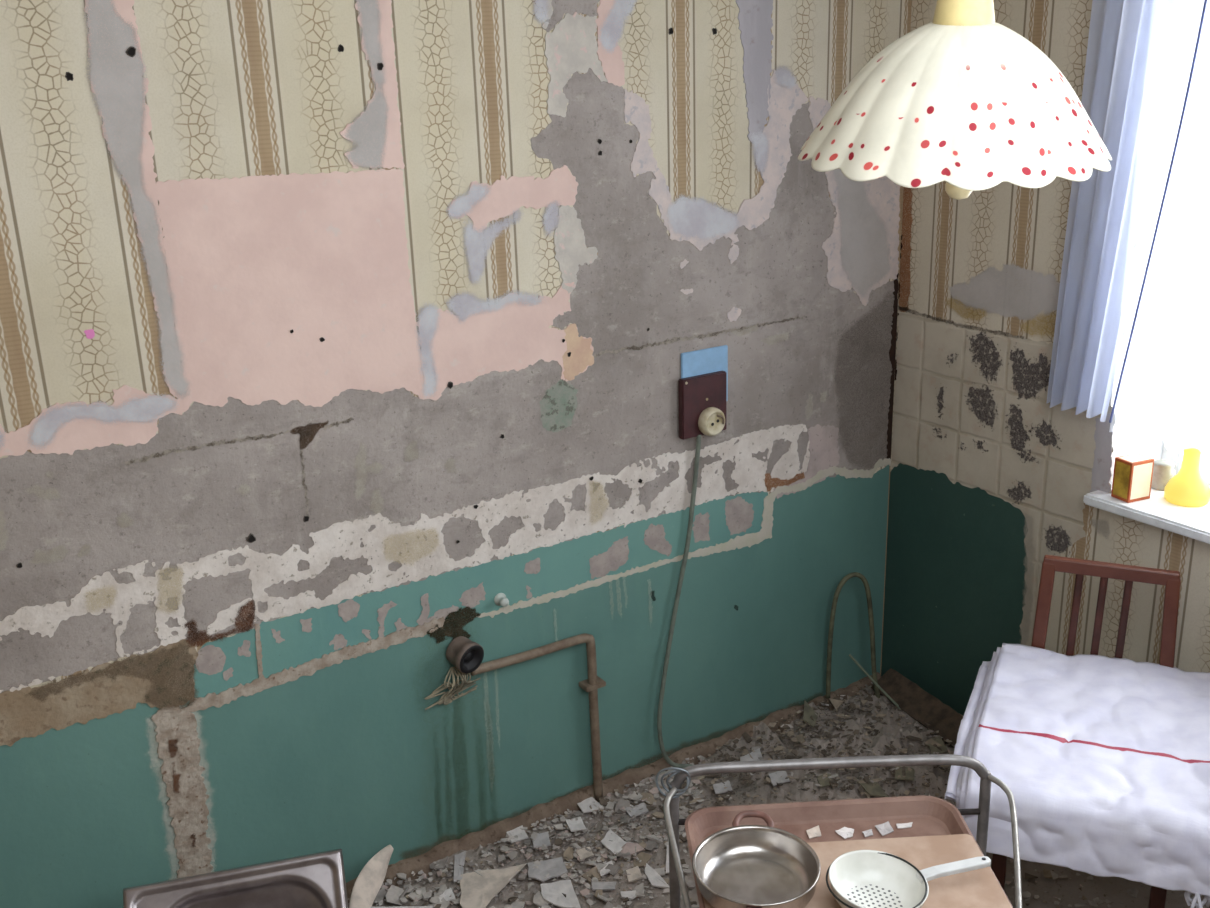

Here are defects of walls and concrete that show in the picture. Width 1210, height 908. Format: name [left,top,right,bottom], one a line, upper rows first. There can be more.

flaking render [543,0,600,32]
crack [324,417,354,430]
damp [932,387,946,440]
damp [945,296,1063,463]
crack [122,430,309,515]
flaking render [0,68,913,878]
flaking render [891,309,1101,646]
flaking render [527,857,581,908]